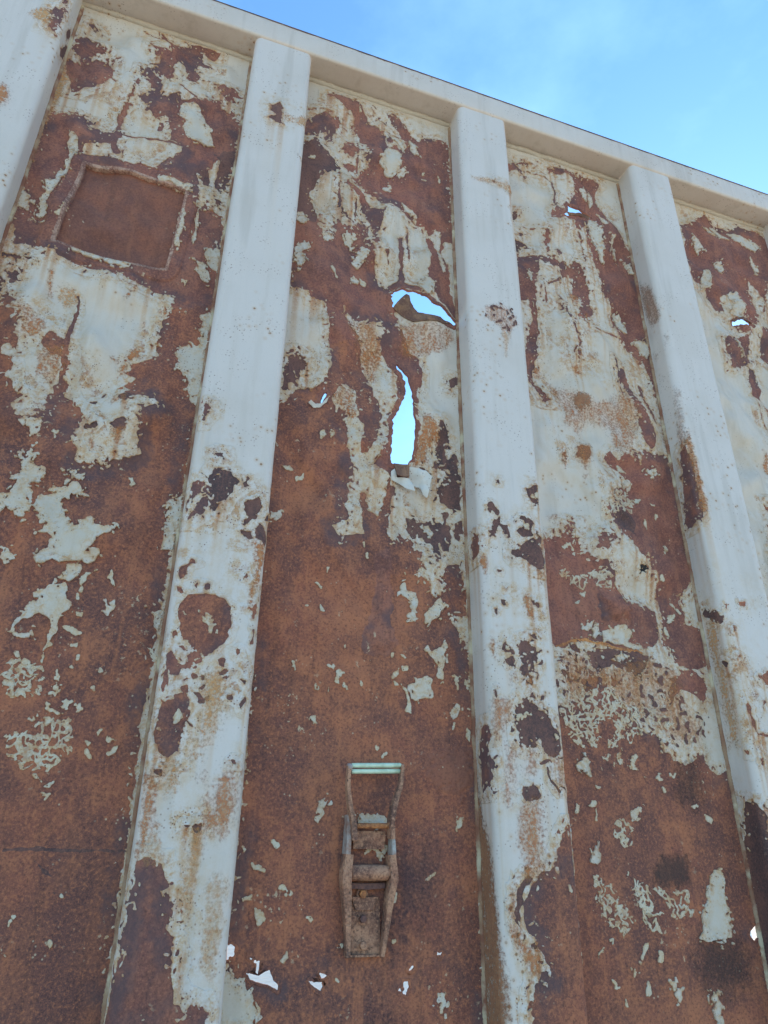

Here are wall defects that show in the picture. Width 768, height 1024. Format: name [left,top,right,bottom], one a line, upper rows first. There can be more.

spalling [38,0,126,100]
rust [35,270,80,380]
rust [385,224,455,317]
rust [641,287,658,323]
rust [413,413,440,465]
rust [555,391,638,448]
peeling [0,28,506,1024]
rust [178,593,232,655]
peeling [467,155,768,1024]
rust [135,762,175,857]
rust [202,775,236,836]
rust [477,787,542,1024]